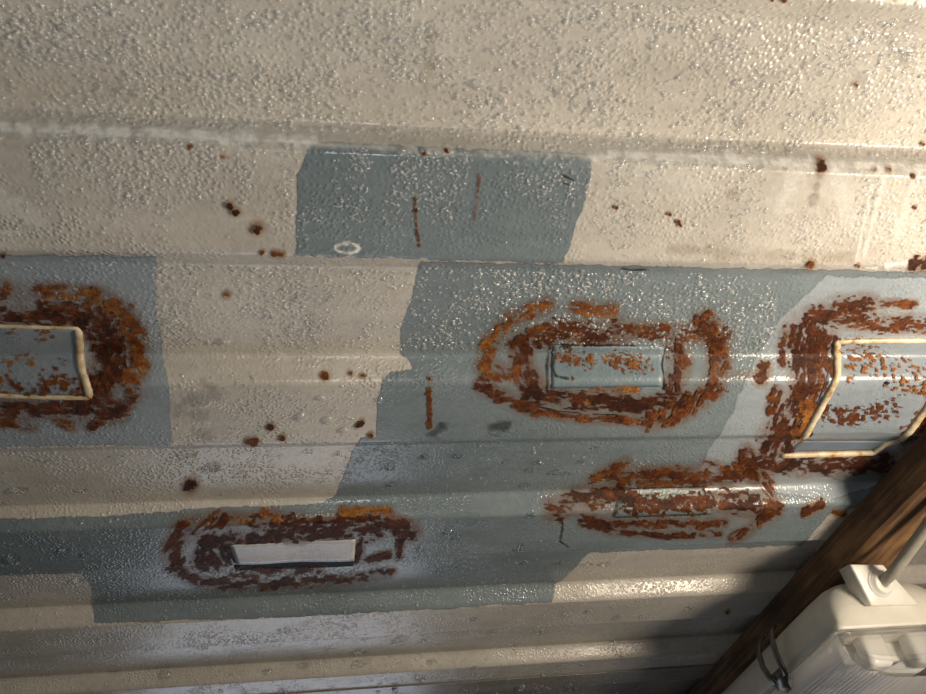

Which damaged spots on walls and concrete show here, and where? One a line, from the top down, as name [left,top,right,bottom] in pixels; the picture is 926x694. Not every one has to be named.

rust [908,255,926,271]
rust [0,282,151,433]
rust [425,377,433,430]
rust [474,300,733,433]
rust [545,295,926,542]
rust [164,506,417,592]